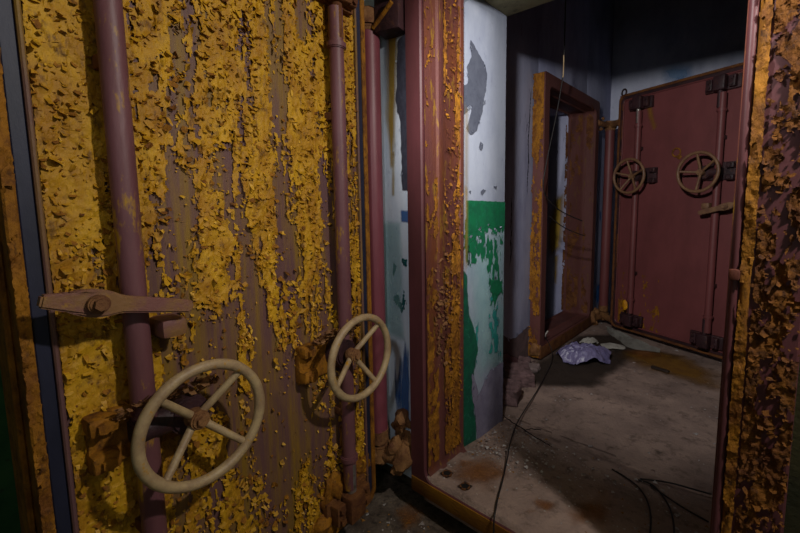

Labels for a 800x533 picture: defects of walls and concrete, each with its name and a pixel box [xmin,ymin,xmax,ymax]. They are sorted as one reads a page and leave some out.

peeling [22,0,120,293]
peeling [55,311,140,533]
corrosion [131,51,188,151]
corrosion [157,0,267,112]
peeling [122,0,338,391]
corrosion [185,117,285,237]
peeling [160,372,343,533]
corrosion [434,0,463,453]
peeling [464,41,487,135]
peeling [464,186,529,439]
corrosion [549,197,562,282]
corrosion [737,299,800,494]